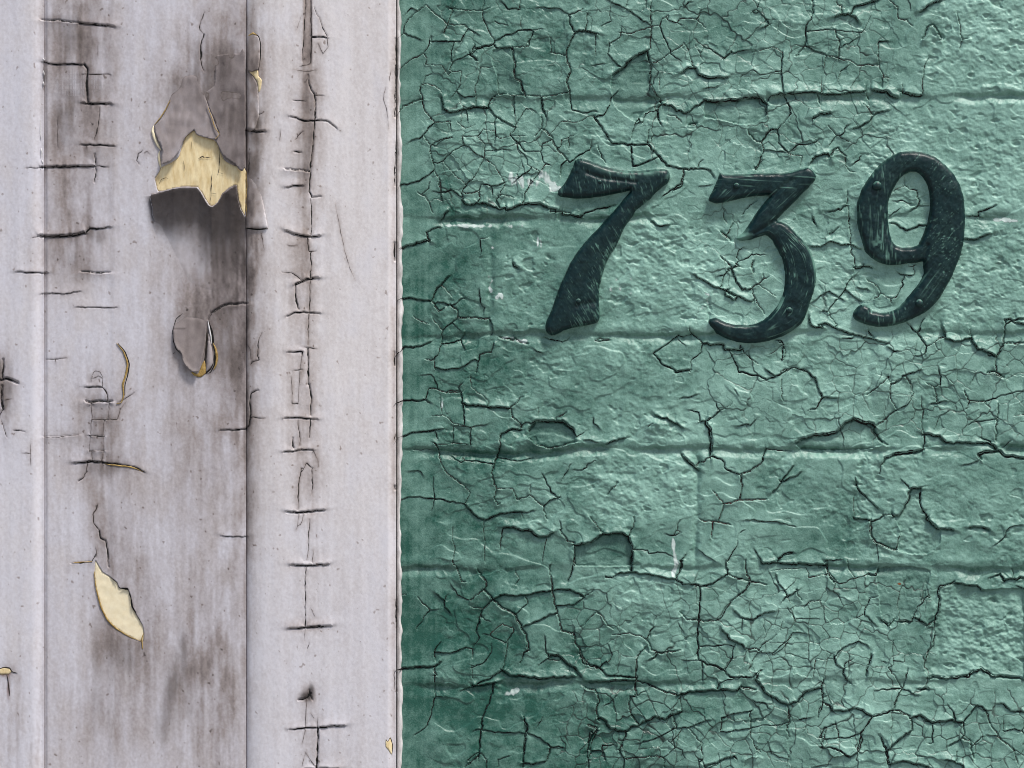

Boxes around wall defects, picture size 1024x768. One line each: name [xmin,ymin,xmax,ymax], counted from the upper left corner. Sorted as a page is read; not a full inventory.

crack [29,62,110,181]
peeling [150,33,268,291]
crack [383,0,963,257]
crack [33,227,106,238]
peeling [172,313,218,377]
crack [285,0,352,646]
crack [61,371,144,481]
crack [394,199,1024,768]
peeling [573,533,633,566]
peeling [74,561,144,649]
crack [293,691,339,768]